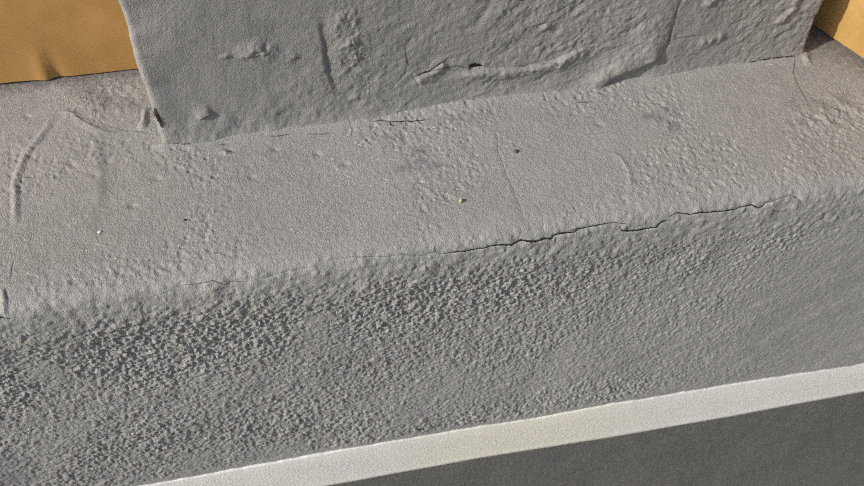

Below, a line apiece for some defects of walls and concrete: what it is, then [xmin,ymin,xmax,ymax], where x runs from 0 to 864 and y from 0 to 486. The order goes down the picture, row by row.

crack [403,32,465,77]
crack [740,56,809,104]
crack [118,130,804,301]